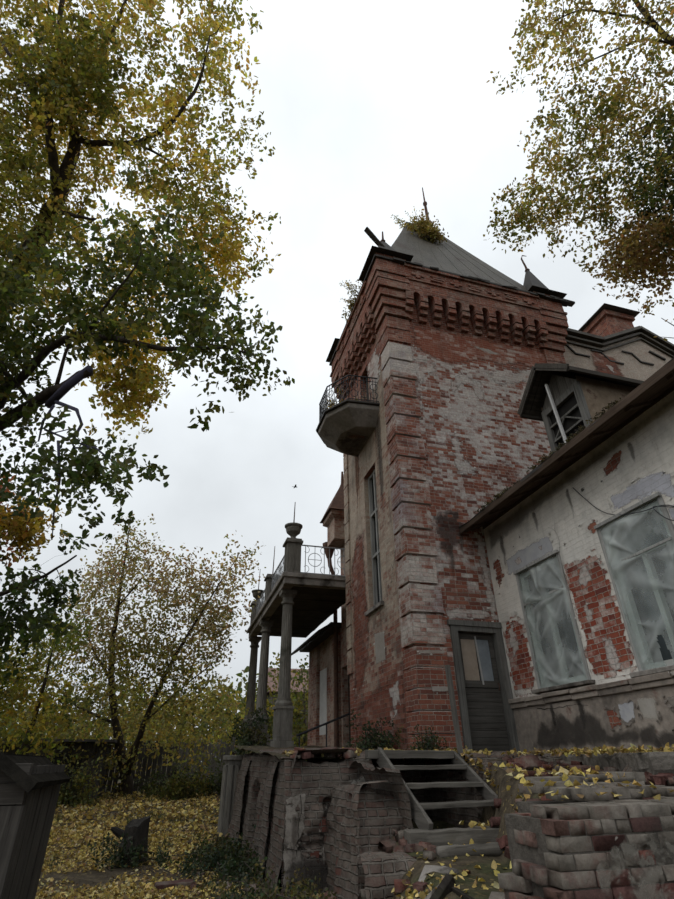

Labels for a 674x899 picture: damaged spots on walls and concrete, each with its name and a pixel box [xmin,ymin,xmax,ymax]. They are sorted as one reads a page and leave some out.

flaking render [412,326,546,419]
peeling [449,432,479,475]
peeling [601,451,623,483]
peeling [493,532,566,594]
peeling [562,549,637,679]
peeling [444,607,535,697]
leakage [537,701,674,748]
leakage [597,863,667,899]